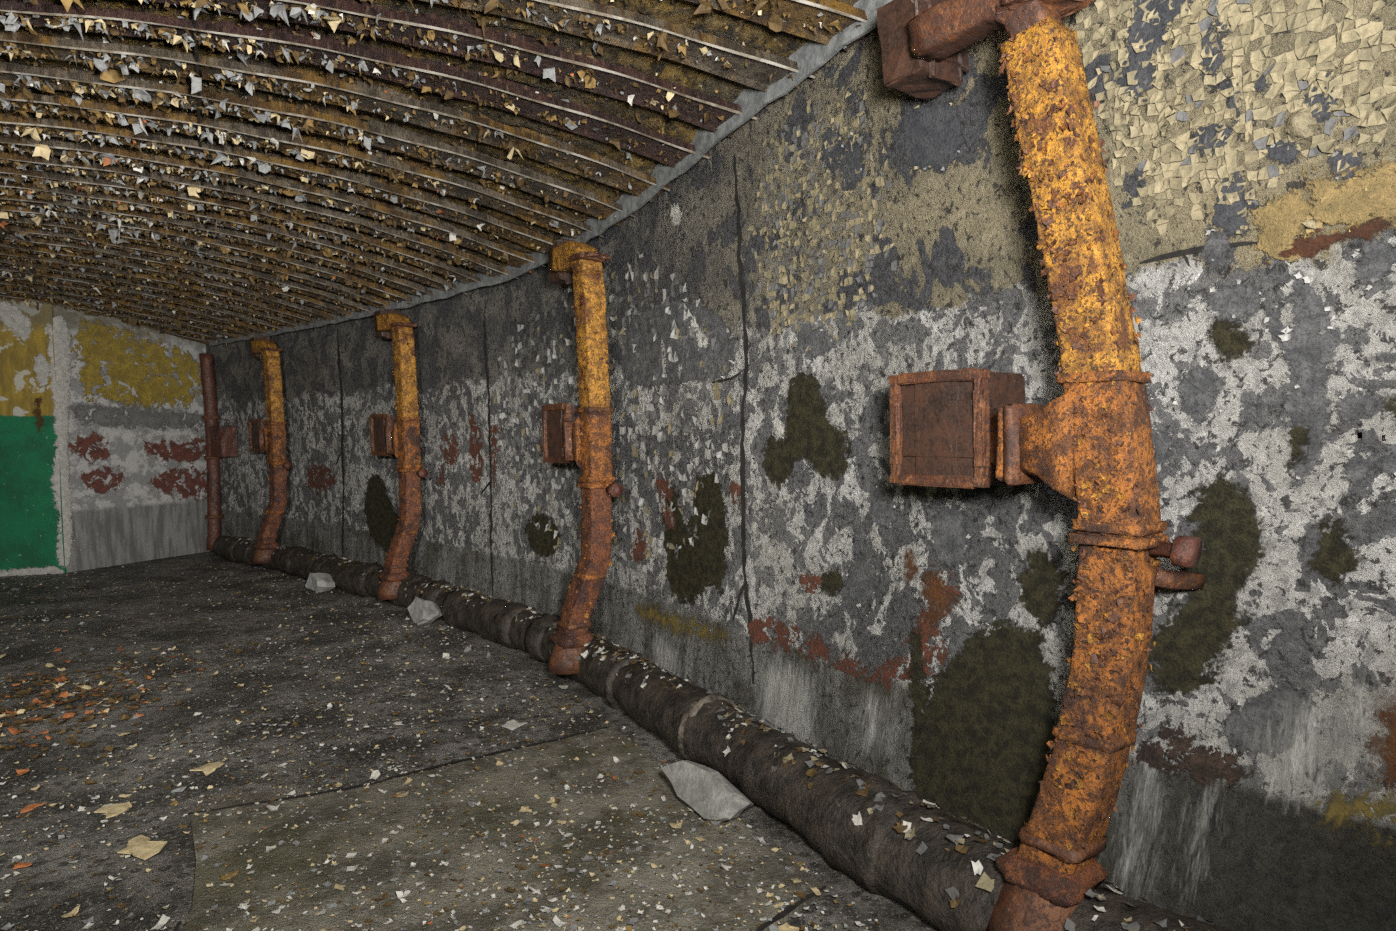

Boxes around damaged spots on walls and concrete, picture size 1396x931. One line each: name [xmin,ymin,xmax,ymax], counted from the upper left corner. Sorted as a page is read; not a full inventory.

peeling [0,0,898,577]
peeling [1076,0,1396,493]
water stain [761,371,852,495]
water stain [364,474,399,551]
water stain [524,513,561,558]
water stain [662,471,731,606]
water stain [1148,470,1265,698]
water stain [907,543,1068,843]
rust [1317,696,1396,845]
crack [756,885,827,931]